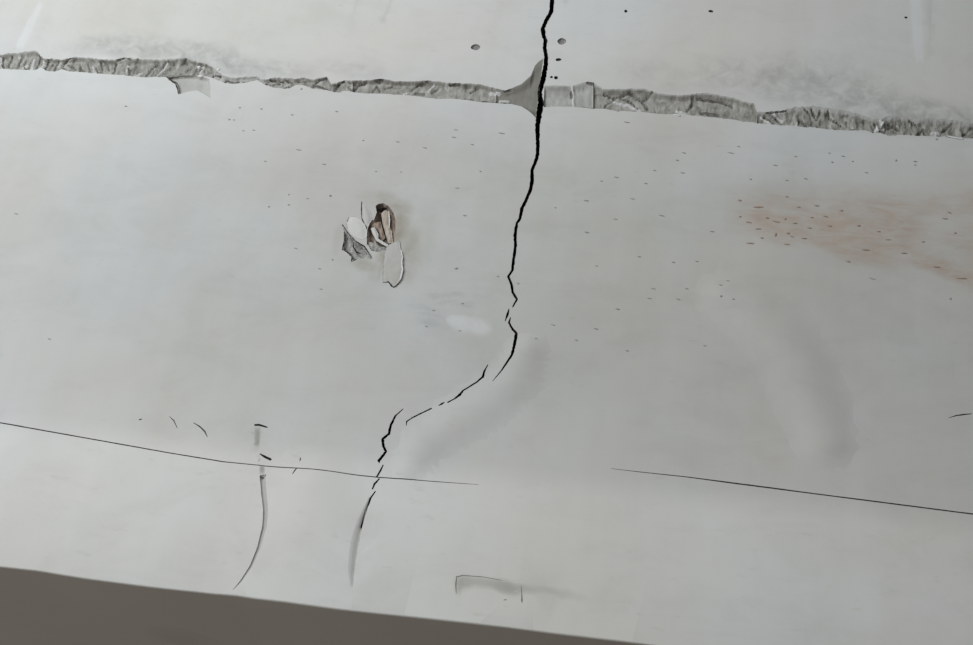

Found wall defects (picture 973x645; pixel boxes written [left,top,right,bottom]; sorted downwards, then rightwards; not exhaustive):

spalling [166,66,211,98]
spalling [496,59,543,118]
crack [0,0,554,588]
spalling [322,181,452,294]
corrosion [687,150,973,312]